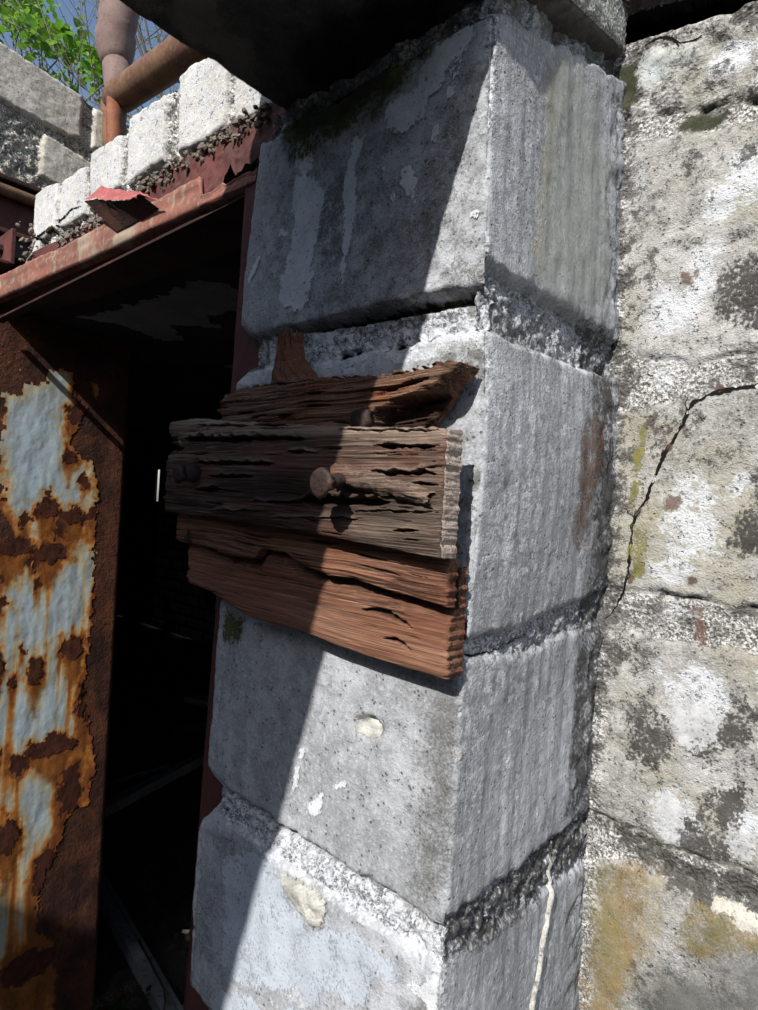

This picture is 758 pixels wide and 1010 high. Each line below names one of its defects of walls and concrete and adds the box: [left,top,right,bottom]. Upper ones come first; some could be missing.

peeling [384,23,476,142]
peeling [337,133,367,284]
peeling [390,165,419,205]
peeling [75,256,260,343]
rust [62,451,76,487]
crack [605,382,758,618]
rust [33,498,87,586]
rust [28,655,43,709]
rust [61,637,85,683]
rust [23,738,77,782]
rust [0,819,19,894]